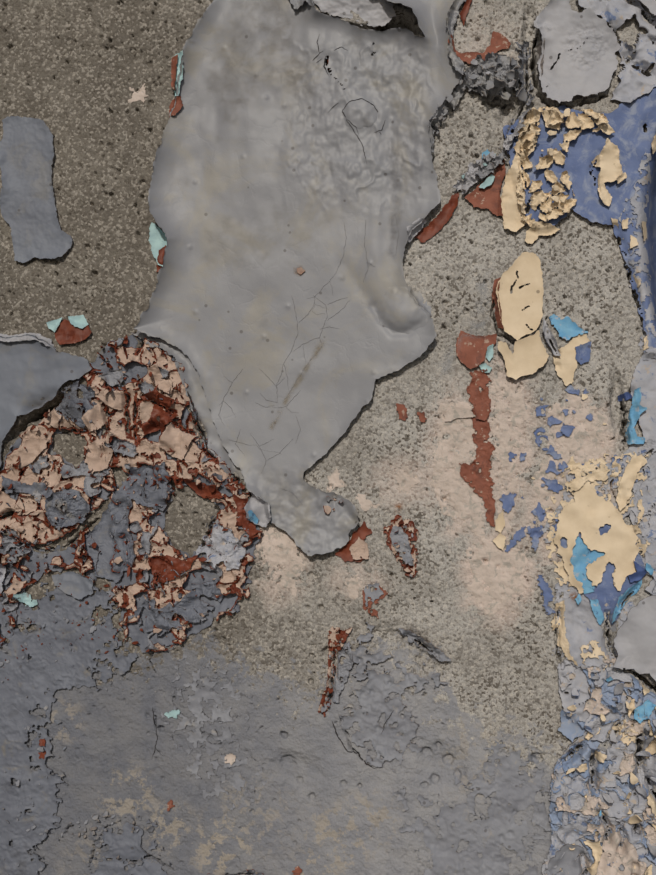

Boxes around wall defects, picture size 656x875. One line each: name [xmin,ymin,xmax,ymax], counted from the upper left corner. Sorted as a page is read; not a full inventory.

crack [313,40,385,163]
crack [171,221,375,472]
peeling [0,0,656,668]
peeling [456,252,656,875]
crack [332,721,375,769]